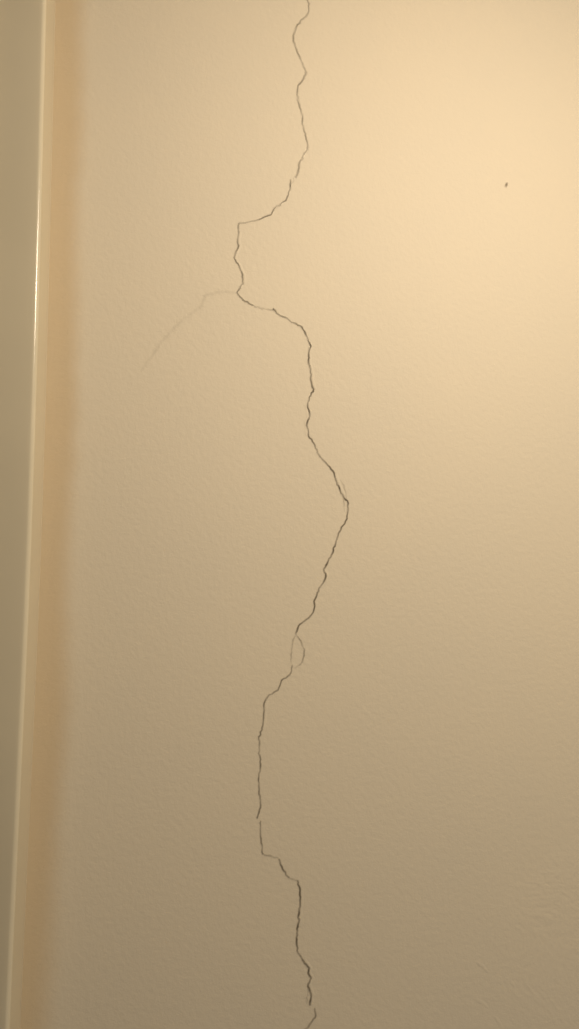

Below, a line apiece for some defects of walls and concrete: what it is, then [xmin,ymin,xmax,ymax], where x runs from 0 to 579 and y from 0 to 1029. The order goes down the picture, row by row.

crack [234,232,248,302]
crack [302,327,317,442]
crack [297,466,349,630]
crack [281,865,315,1005]